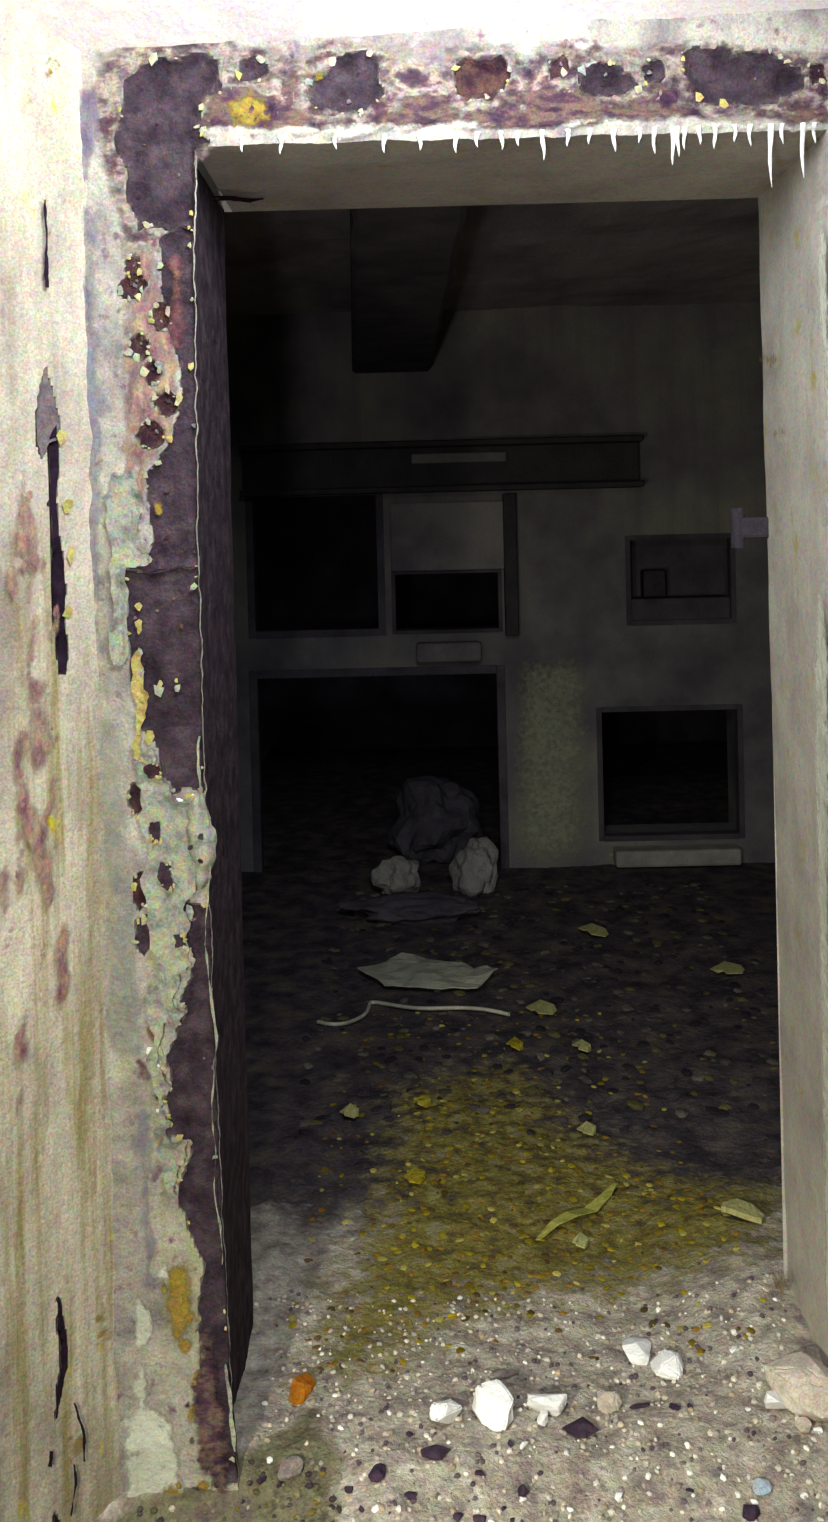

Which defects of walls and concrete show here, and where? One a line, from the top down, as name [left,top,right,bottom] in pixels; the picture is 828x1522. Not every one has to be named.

spalling [294,38,401,126]
rust [196,43,709,131]
spalling [543,41,828,121]
rust [739,53,828,124]
damp [277,124,423,154]
damp [453,123,546,160]
damp [636,122,817,187]
crack [42,199,50,288]
rust [118,241,183,515]
crack [36,367,75,675]
spalling [95,41,278,1491]
crack [48,1297,86,1522]